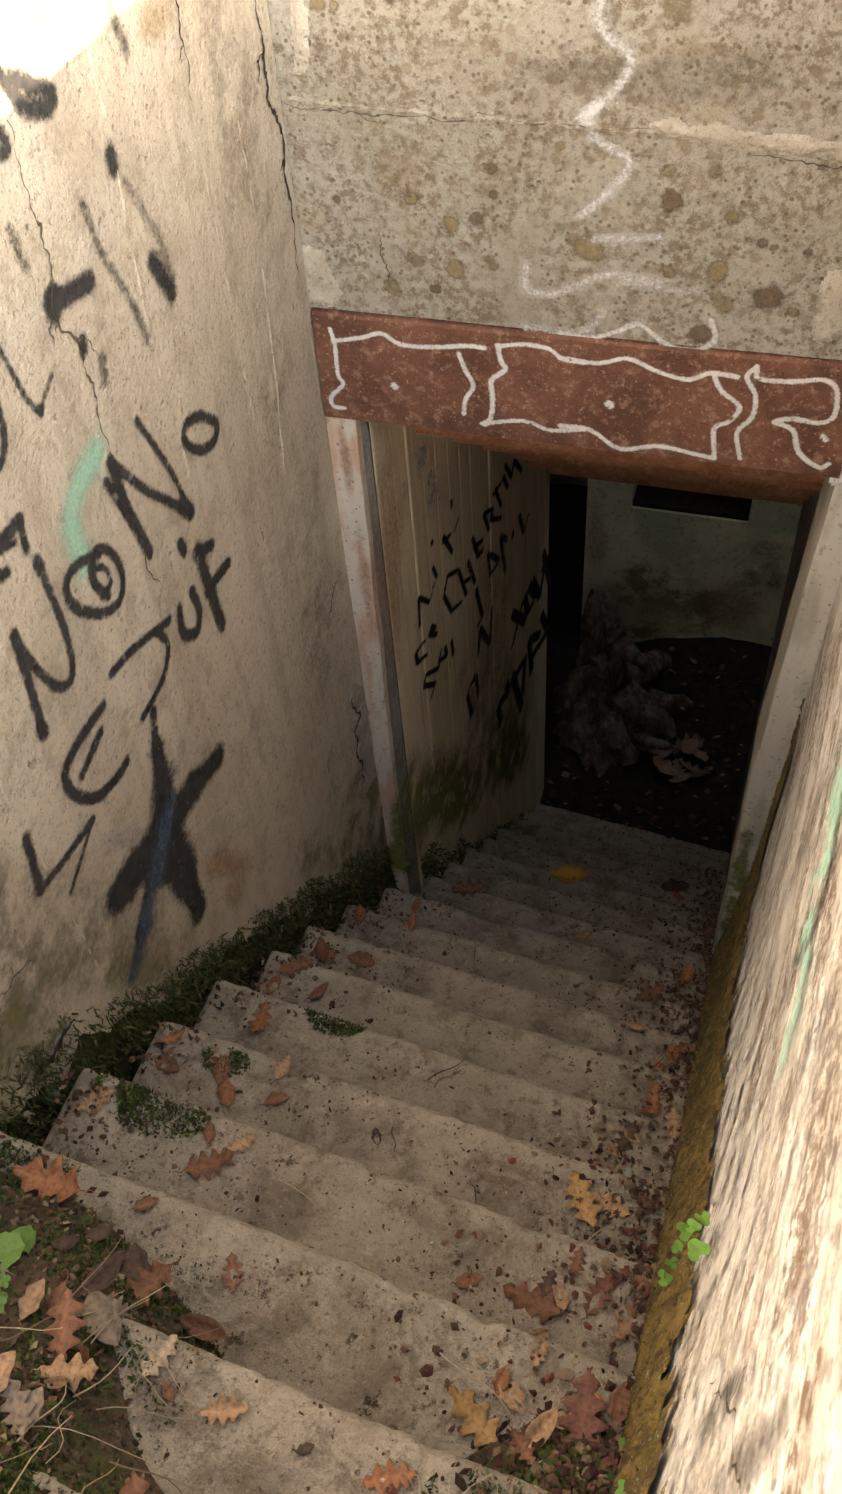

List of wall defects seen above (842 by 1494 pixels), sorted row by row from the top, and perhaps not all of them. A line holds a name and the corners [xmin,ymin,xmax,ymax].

crack [255,0,655,271]